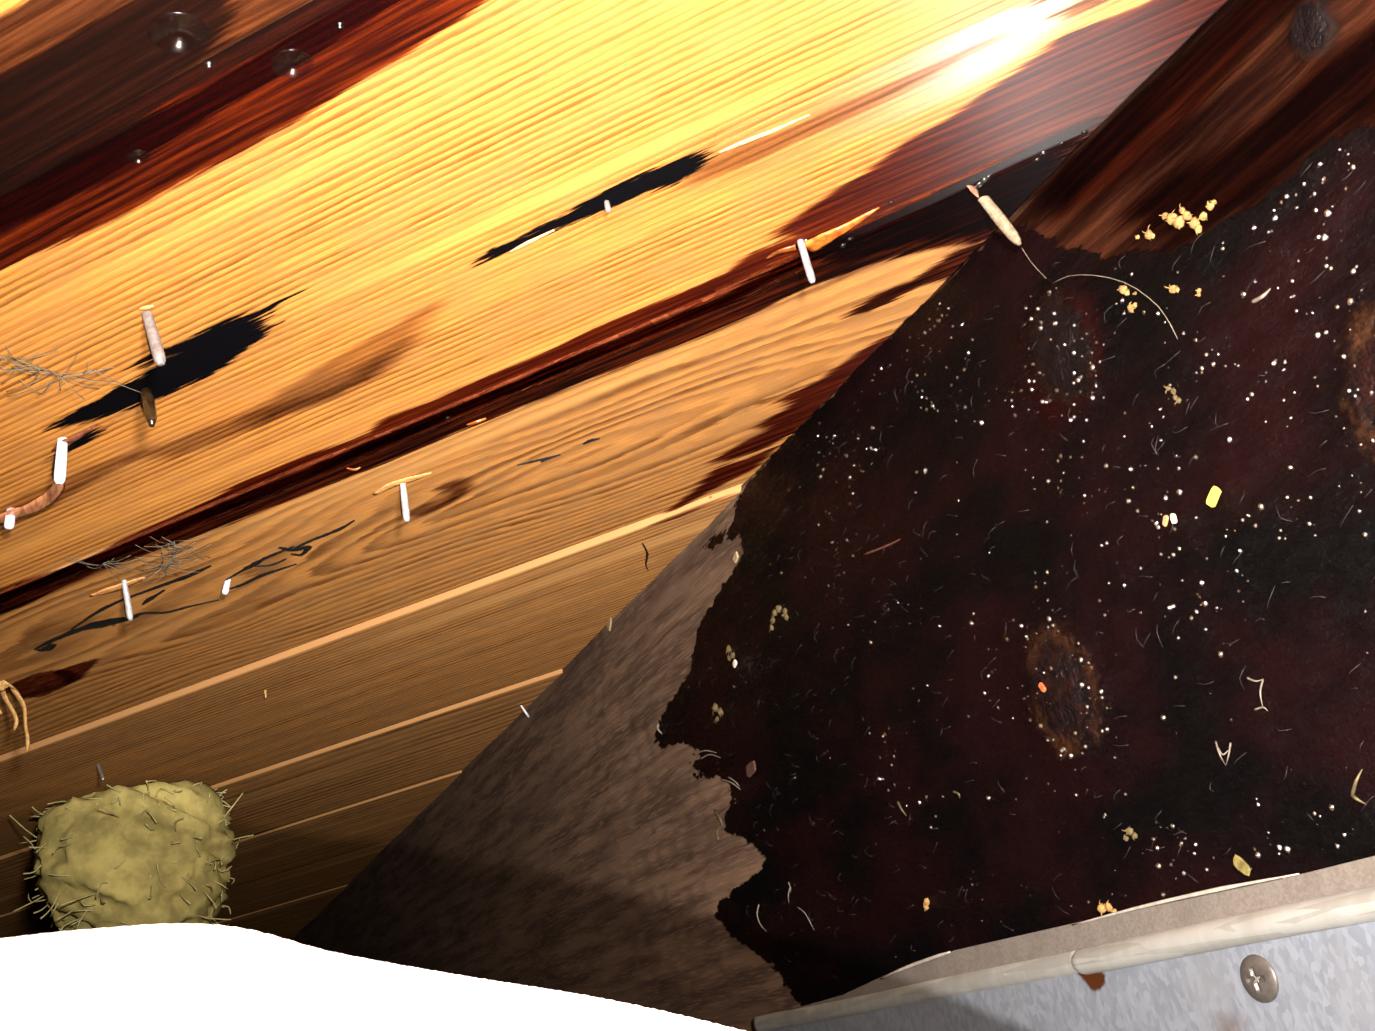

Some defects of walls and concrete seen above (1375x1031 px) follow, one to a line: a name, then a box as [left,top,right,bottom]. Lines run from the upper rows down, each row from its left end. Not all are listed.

crack [34,520,355,651]
leakage [0,0,1375,614]